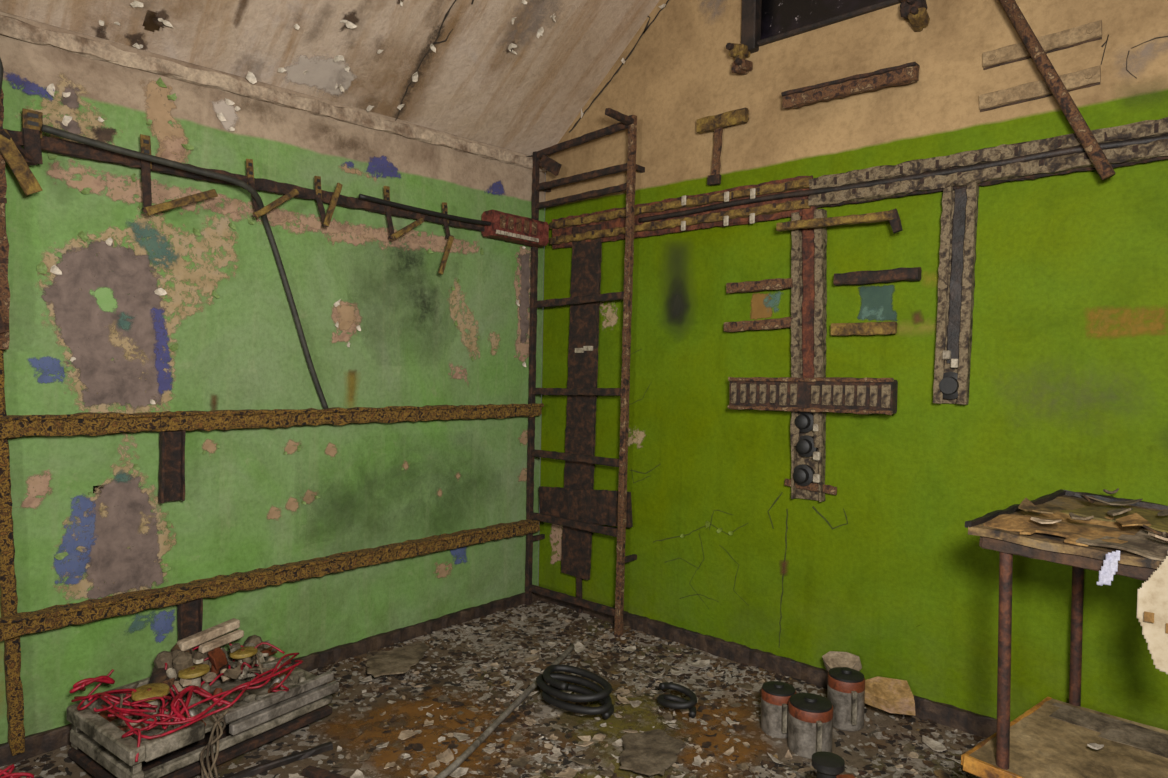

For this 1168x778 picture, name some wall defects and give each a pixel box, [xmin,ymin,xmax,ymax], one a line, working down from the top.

spalling [96,20,147,50]
peeling [155,10,174,28]
peeling [340,11,358,30]
peeling [278,55,356,95]
peeling [5,73,116,145]
peeling [145,77,194,163]
peeling [213,98,241,131]
peeling [28,152,484,414]
peeling [21,470,52,508]
peeling [53,432,176,600]
crack [653,492,848,646]
peeling [128,610,176,642]